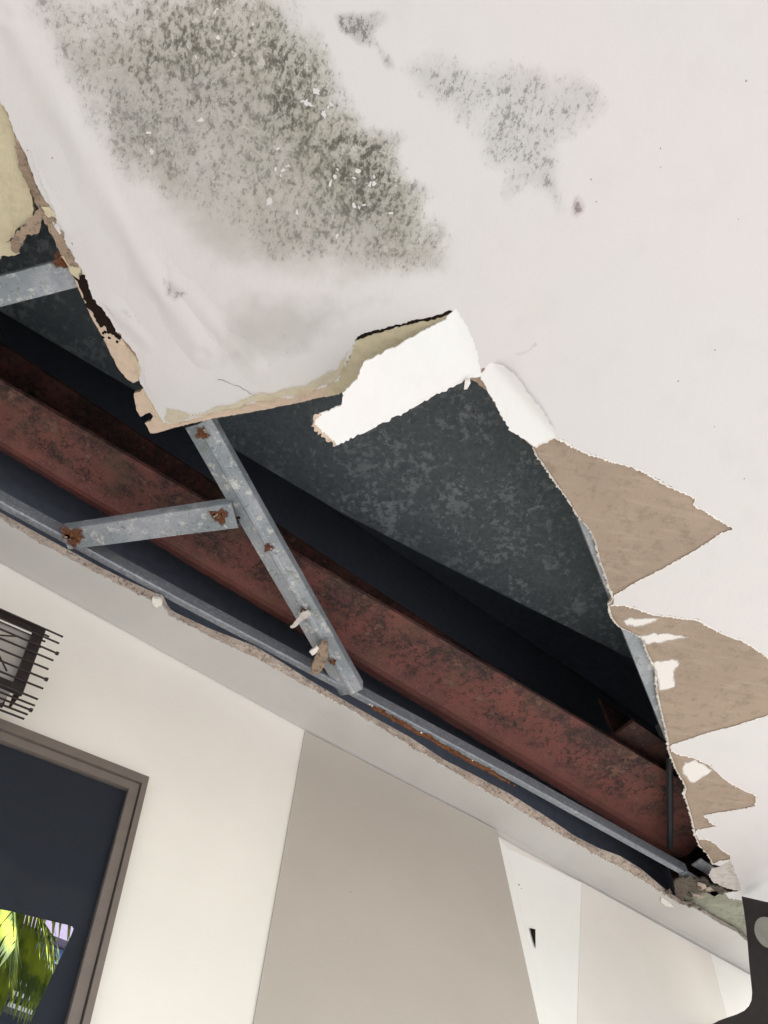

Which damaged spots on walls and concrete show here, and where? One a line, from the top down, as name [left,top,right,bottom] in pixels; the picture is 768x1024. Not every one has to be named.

leakage [65,0,436,261]
leakage [430,71,592,187]
peeling [311,309,481,447]
rust [61,526,84,548]
rust [209,508,227,525]
peeling [535,438,768,864]
spalling [0,513,747,940]
rust [369,703,515,787]